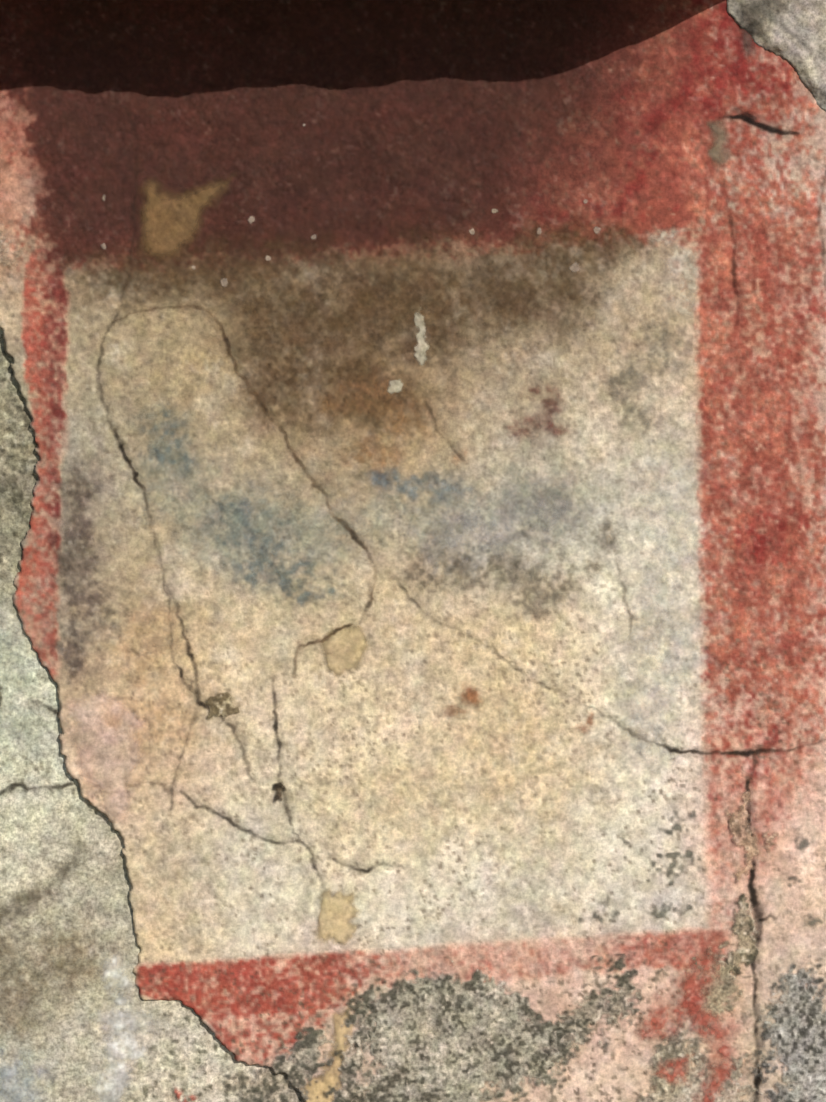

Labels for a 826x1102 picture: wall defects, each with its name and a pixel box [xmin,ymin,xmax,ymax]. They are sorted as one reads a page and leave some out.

crack [728,112,799,134]
crack [222,329,248,382]
crack [114,429,144,488]
crack [338,518,367,550]
crack [306,595,373,646]
crack [179,619,235,732]
crack [273,692,281,753]
crack [186,794,373,873]
spalling [727,792,778,882]
crack [662,744,777,1102]
spalling [224,953,645,1102]
spalling [638,894,826,1102]